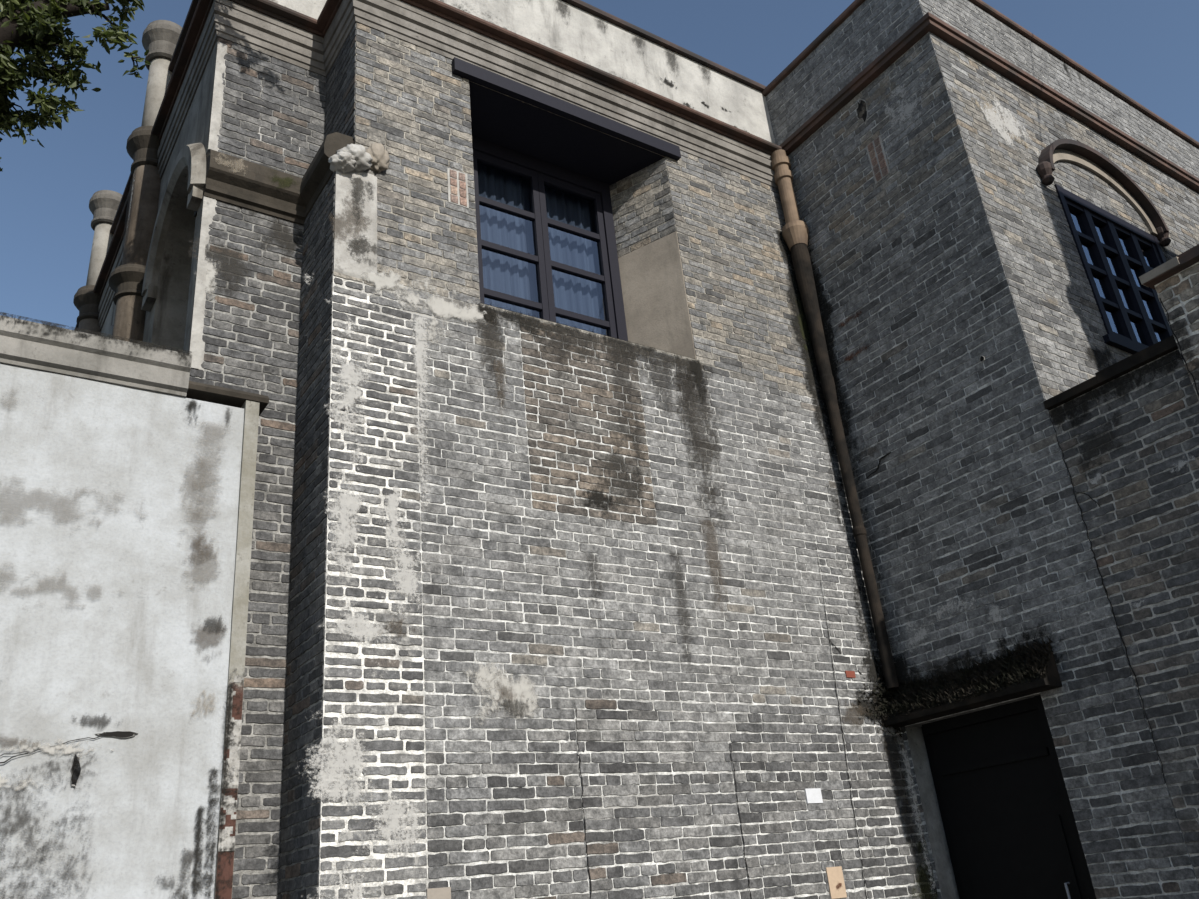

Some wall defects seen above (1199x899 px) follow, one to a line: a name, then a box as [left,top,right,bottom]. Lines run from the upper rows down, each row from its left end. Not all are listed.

leakage [476,304,798,519]
leakage [776,220,1120,694]
crack [0,735,109,763]
peeling [215,668,245,899]